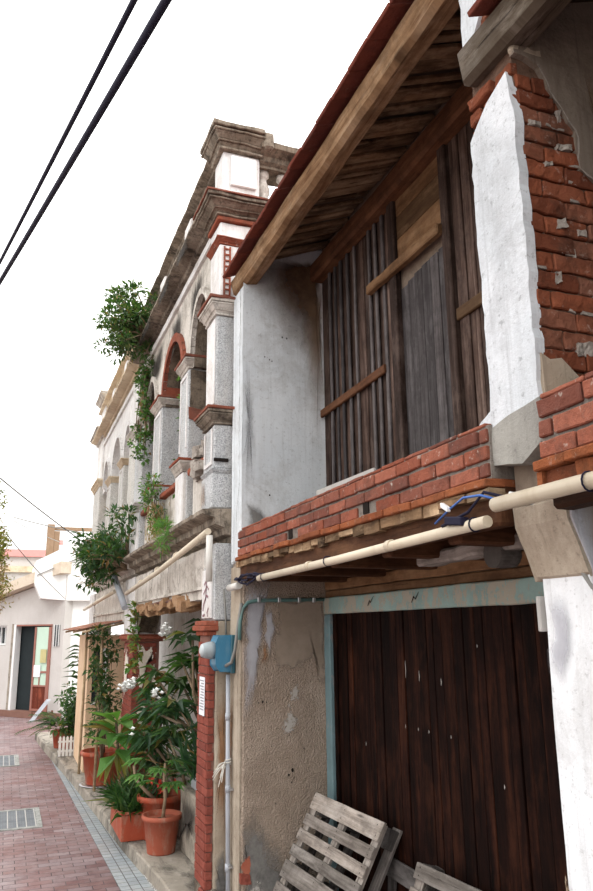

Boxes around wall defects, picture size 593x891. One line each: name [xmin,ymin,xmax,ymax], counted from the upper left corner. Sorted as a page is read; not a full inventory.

spalling [513,64,593,377]
spalling [239,856,251,885]